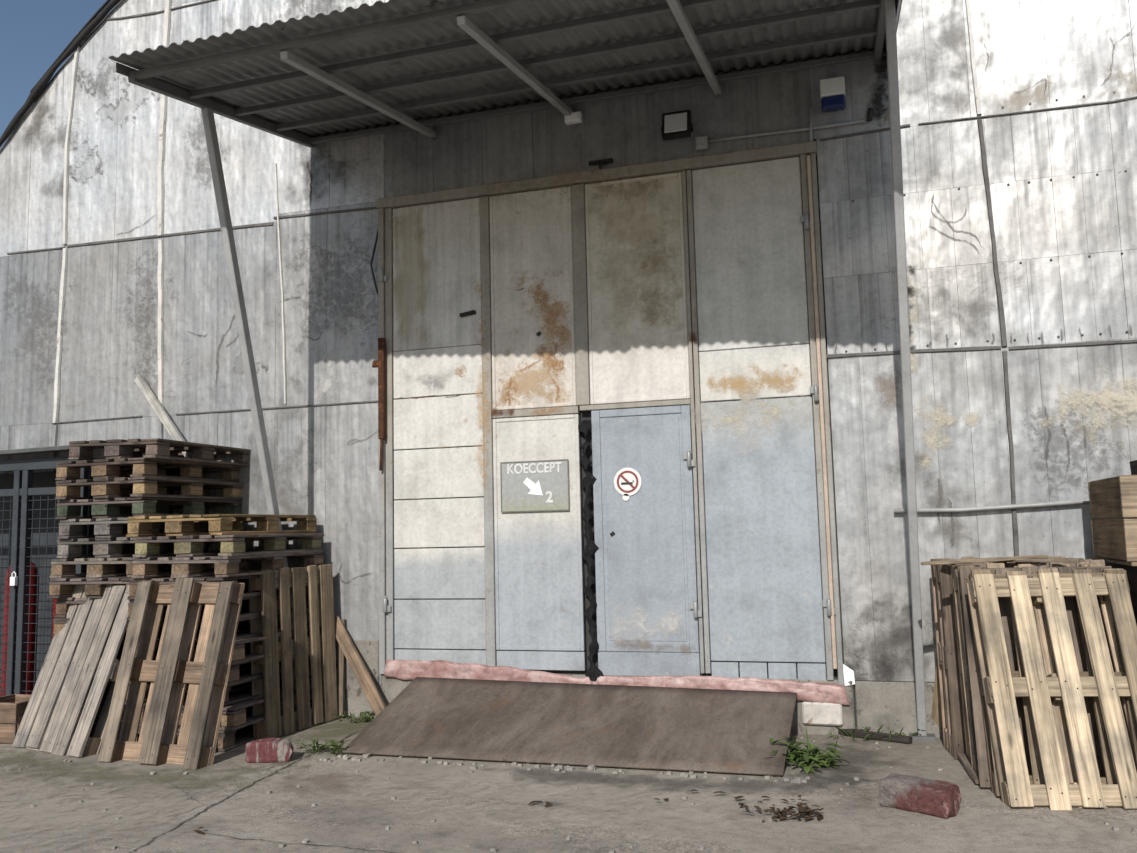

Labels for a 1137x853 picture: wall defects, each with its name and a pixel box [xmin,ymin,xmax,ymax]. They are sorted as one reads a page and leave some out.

damp [25,102,103,194]
rust [475,295,570,427]
rust [709,376,793,398]